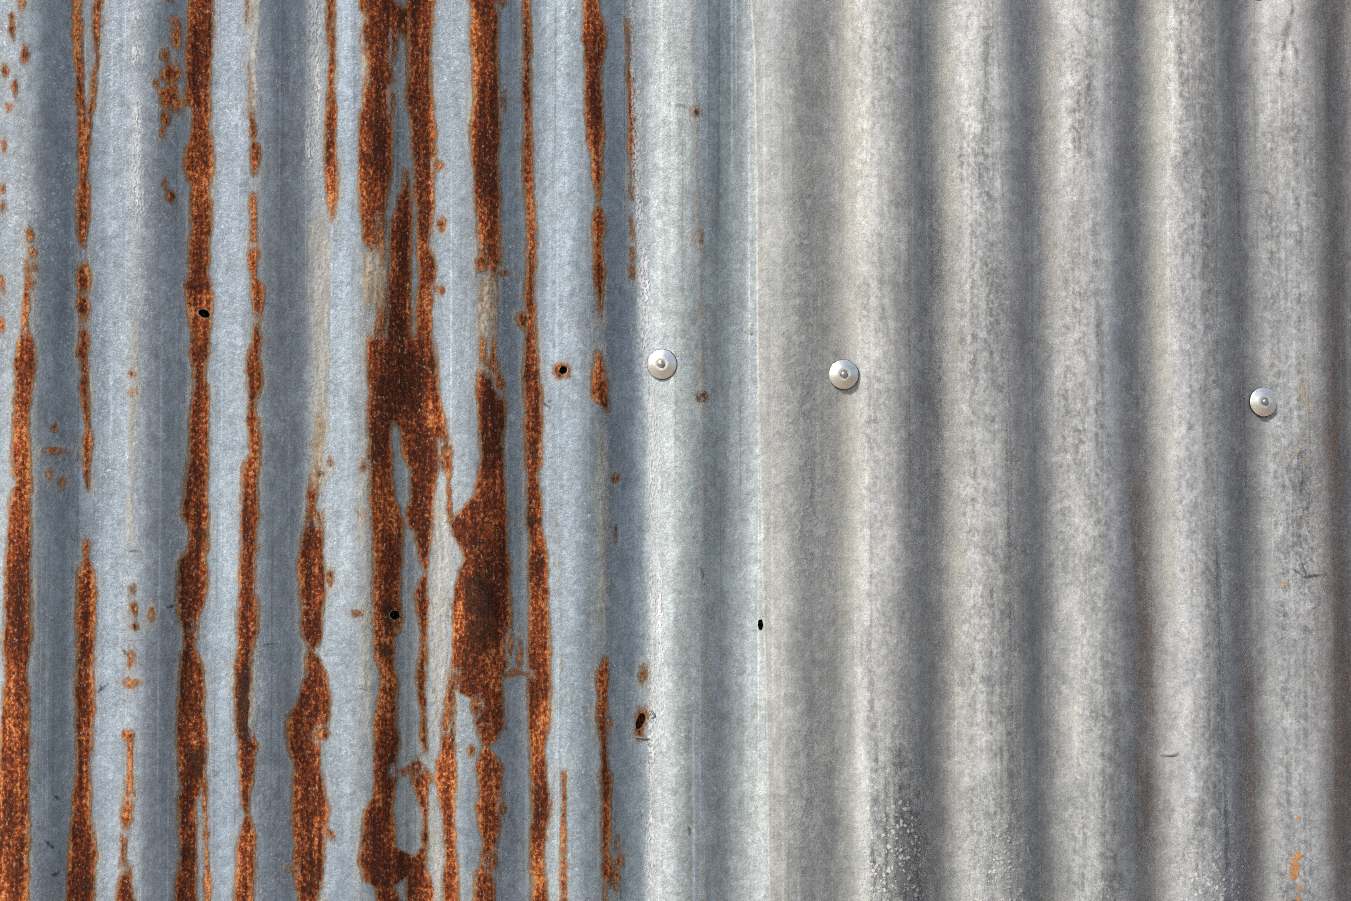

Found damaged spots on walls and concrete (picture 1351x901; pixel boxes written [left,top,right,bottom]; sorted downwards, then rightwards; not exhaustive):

corrosion [2,0,30,114]
corrosion [0,225,66,901]
corrosion [65,539,100,901]
corrosion [71,0,103,490]
corrosion [116,730,136,901]
corrosion [129,0,215,901]
corrosion [233,191,266,901]
corrosion [245,0,260,175]
corrosion [284,0,340,901]
corrosion [350,0,571,901]
corrosion [581,0,607,329]
corrosion [592,657,623,901]